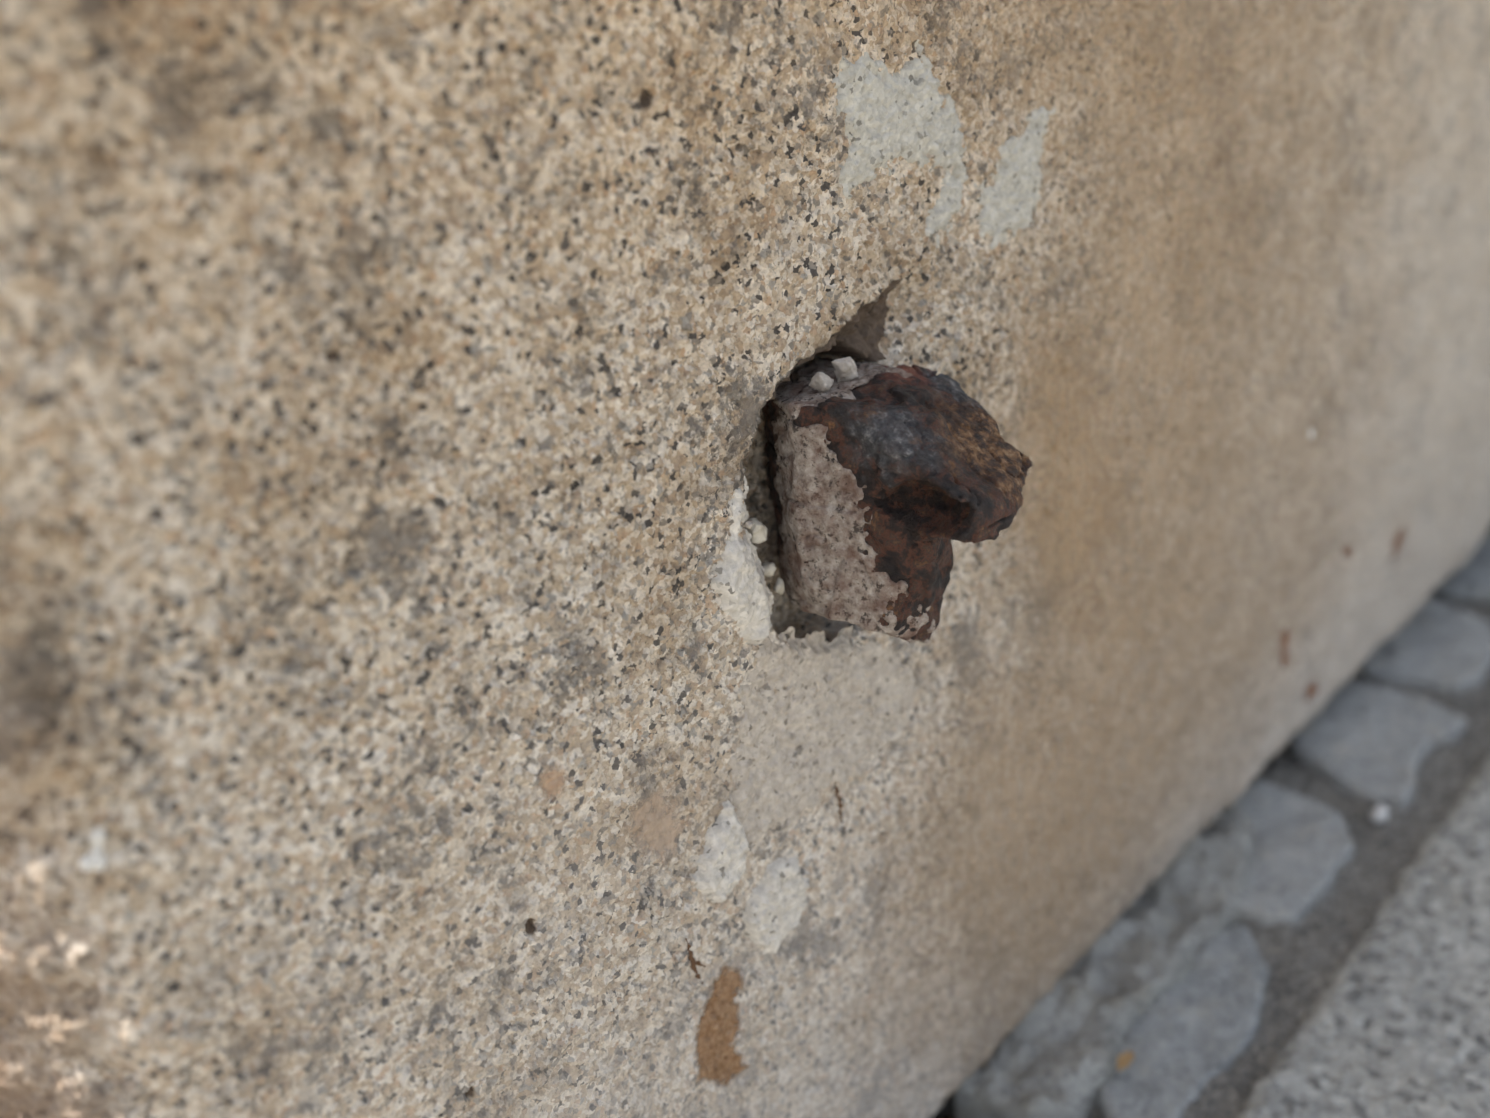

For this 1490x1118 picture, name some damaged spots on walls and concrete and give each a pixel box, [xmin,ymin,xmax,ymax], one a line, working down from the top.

spalling [760,279,902,415]
corrosion [697,966,747,1084]